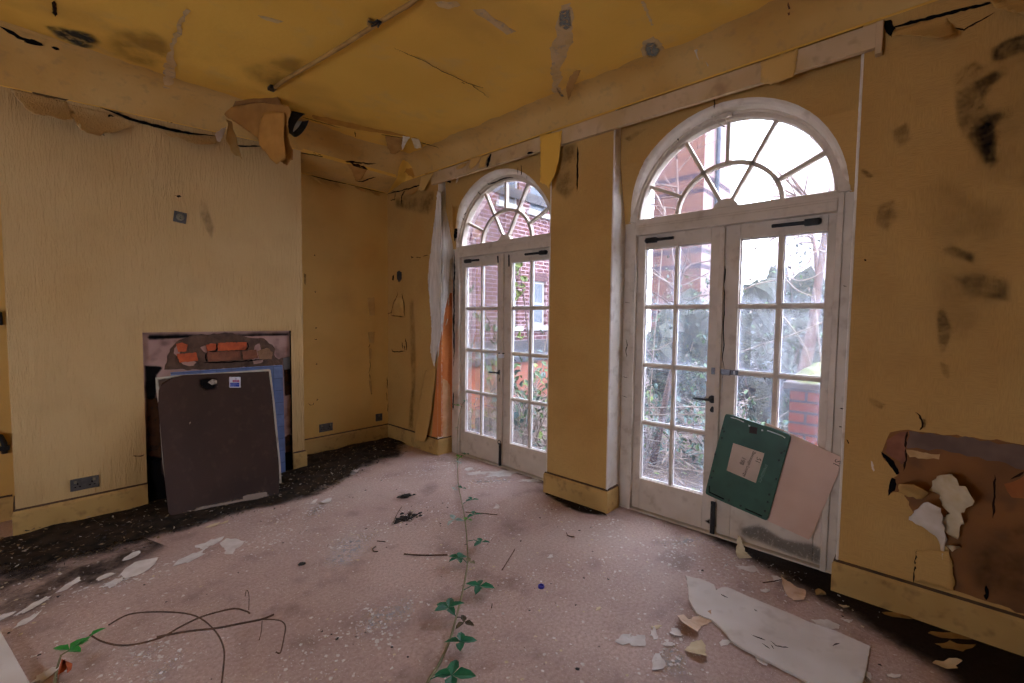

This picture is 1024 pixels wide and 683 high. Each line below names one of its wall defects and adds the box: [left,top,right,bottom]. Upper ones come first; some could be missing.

crack [0,26,59,50]
leakage [52,29,97,48]
crack [399,50,486,96]
peeling [549,3,580,100]
crack [893,2,993,31]
crack [100,107,214,136]
leakage [972,115,1000,160]
peeling [898,474,974,591]